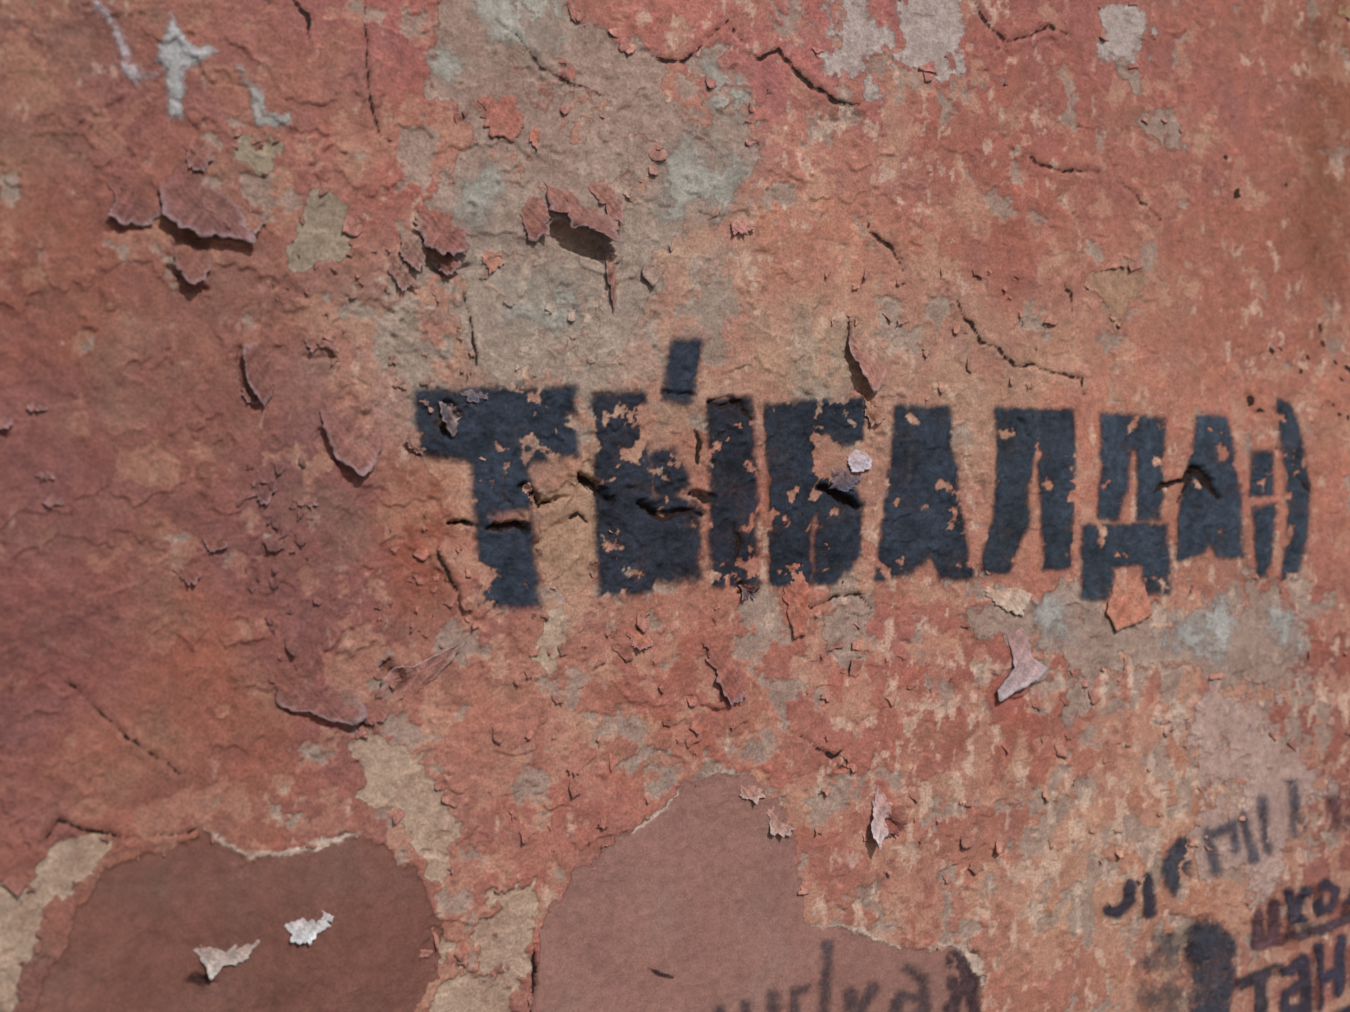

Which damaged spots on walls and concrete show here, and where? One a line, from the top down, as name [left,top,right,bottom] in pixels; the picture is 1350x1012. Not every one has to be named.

crack [652,19,860,114]
peeling [801,0,967,105]
peeling [1096,1,1189,156]
peeling [106,137,268,285]
peeling [272,0,781,437]
peeling [319,409,383,476]
peeling [513,459,613,687]
peeling [275,438,486,888]
peeling [959,563,1350,910]
peeling [193,939,260,980]
peeling [284,911,334,945]
crack [529,949,537,1012]